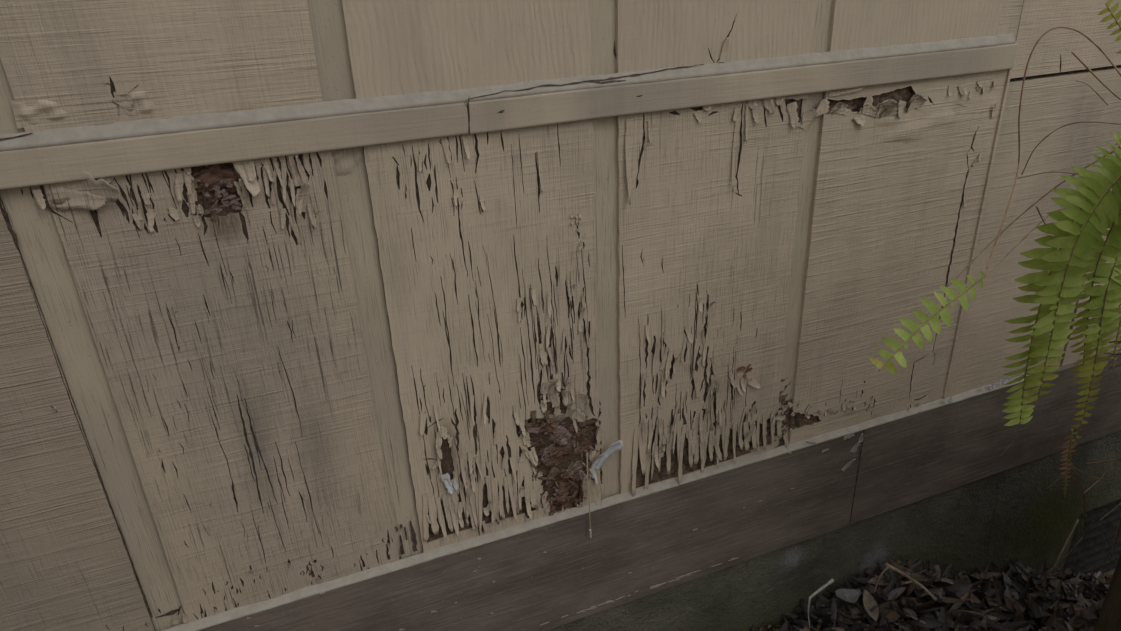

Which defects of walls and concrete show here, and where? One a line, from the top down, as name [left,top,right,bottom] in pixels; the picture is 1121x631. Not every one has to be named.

crack [105,77,138,111]
peeling [669,105,718,123]
spalling [731,87,932,196]
peeling [41,172,130,237]
spalling [183,160,260,239]
crack [359,35,729,570]
crack [0,185,153,630]
crack [121,152,333,618]
spalling [422,299,874,542]